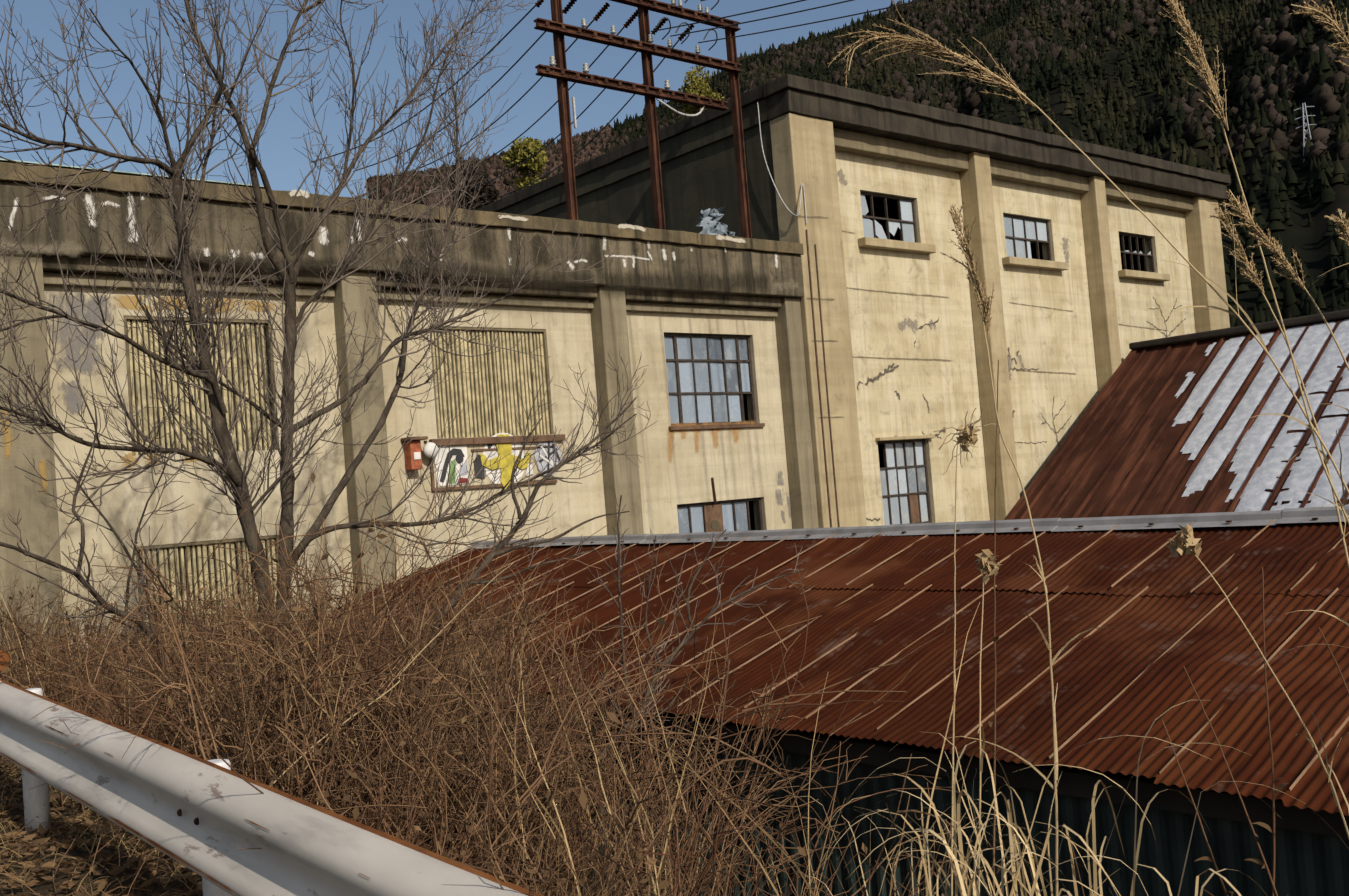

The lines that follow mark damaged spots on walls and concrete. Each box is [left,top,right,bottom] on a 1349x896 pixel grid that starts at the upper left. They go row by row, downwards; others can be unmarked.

rust [669,422,752,457]
crack [857,319,945,442]
crack [1007,348,1071,446]